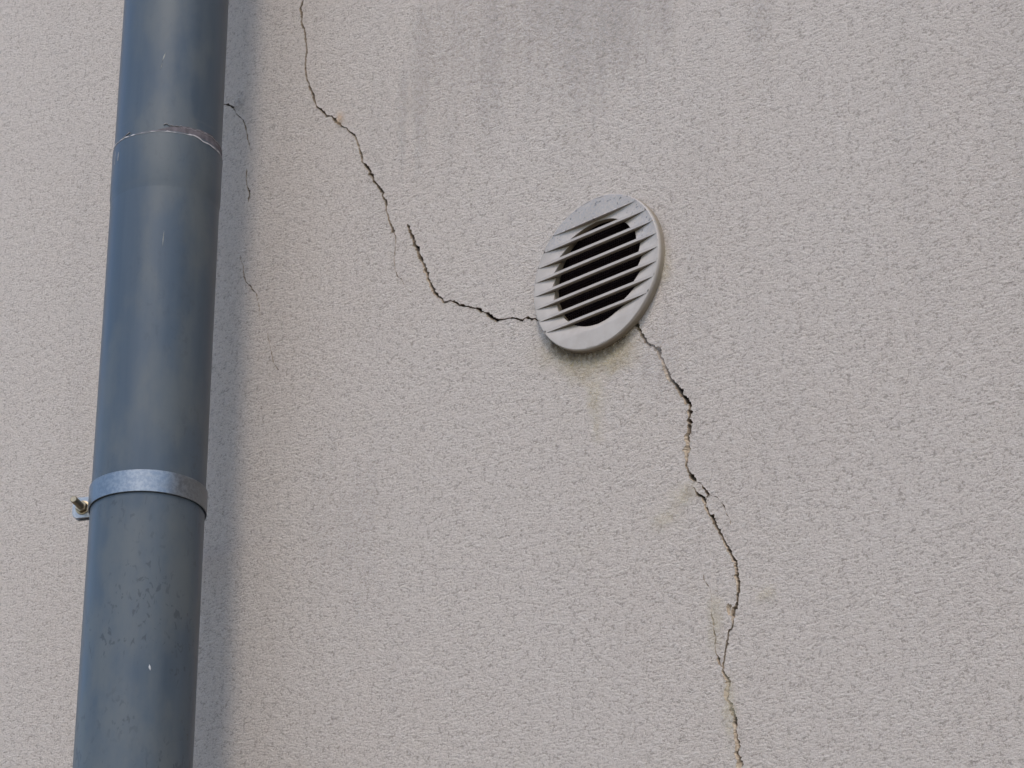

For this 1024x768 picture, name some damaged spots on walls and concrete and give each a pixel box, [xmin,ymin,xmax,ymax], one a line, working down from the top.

crack [299,0,538,323]
crack [634,322,745,768]